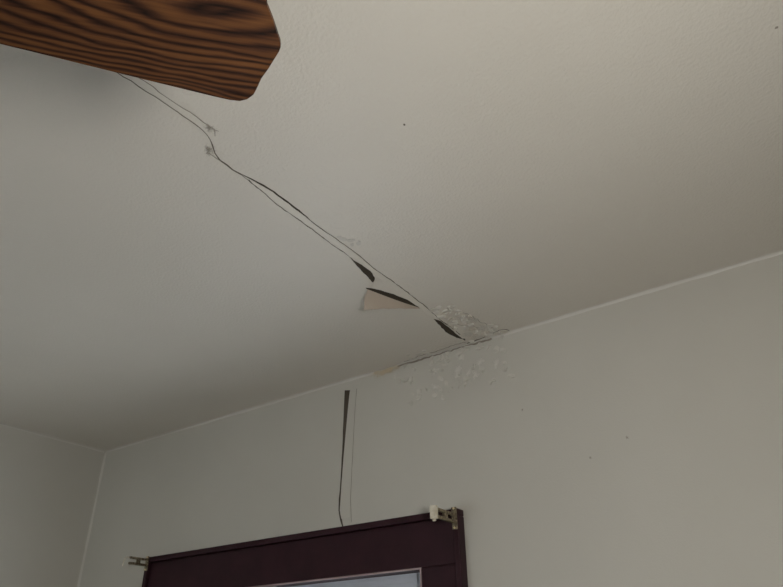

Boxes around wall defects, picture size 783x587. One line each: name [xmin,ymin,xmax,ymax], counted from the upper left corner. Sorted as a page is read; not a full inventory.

crack [118,73,492,367]
crack [338,389,357,526]